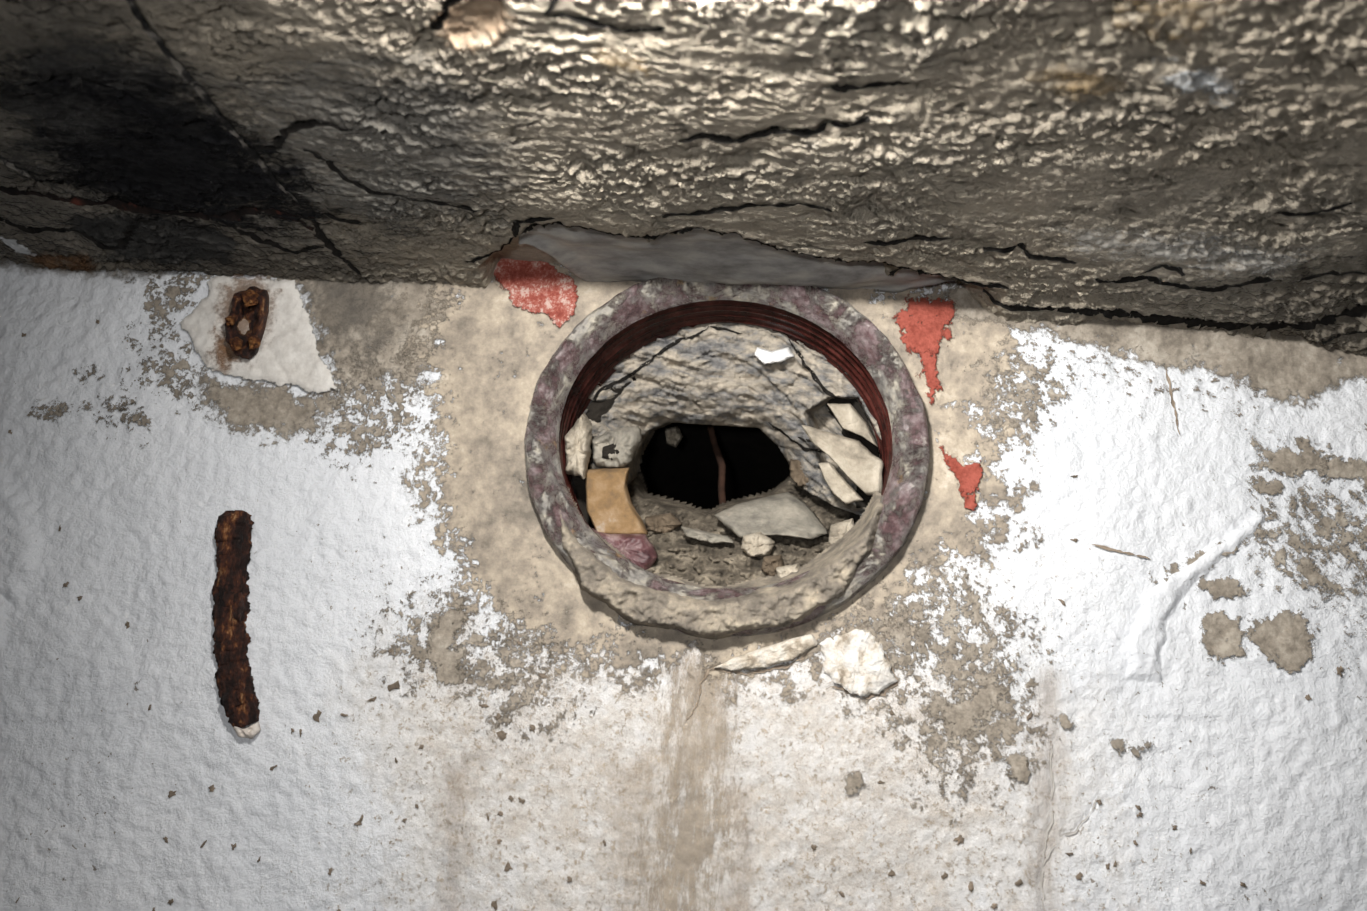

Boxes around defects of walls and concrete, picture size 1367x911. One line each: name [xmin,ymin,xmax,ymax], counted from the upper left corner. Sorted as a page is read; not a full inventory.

crack [417,0,461,33]
crack [543,0,666,33]
crack [0,120,477,275]
water stain [0,0,511,360]
crack [679,81,912,144]
rust [217,276,271,368]
crack [465,202,1367,345]
peeling [27,258,1367,845]
water stain [288,554,1204,911]